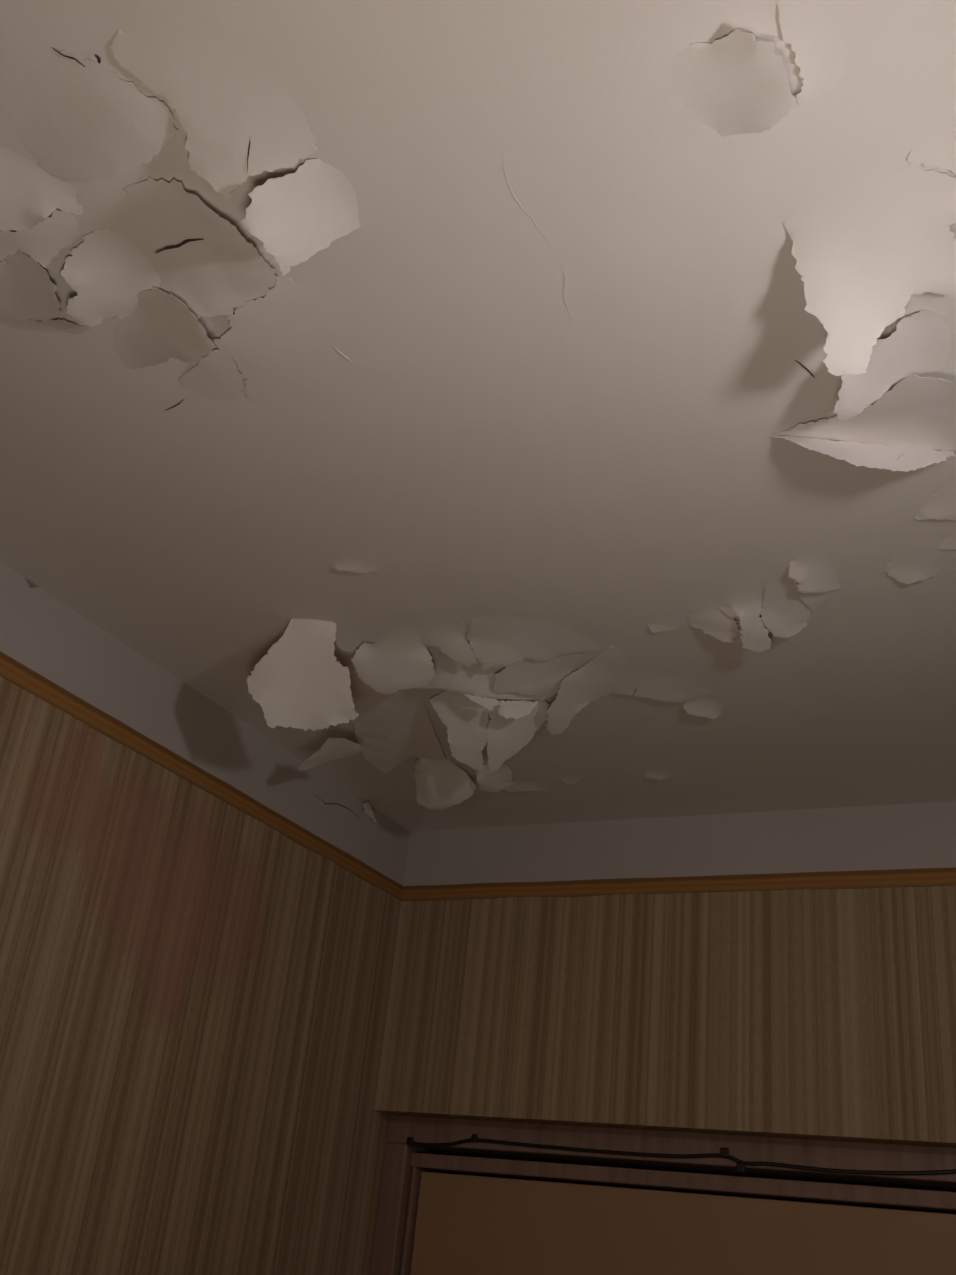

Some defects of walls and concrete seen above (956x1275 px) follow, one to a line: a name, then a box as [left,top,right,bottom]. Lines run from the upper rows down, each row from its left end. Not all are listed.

peeling [0,23,361,411]
peeling [774,137,956,472]
peeling [688,545,841,653]
peeling [885,555,943,584]
peeling [914,480,956,521]
peeling [247,611,723,810]